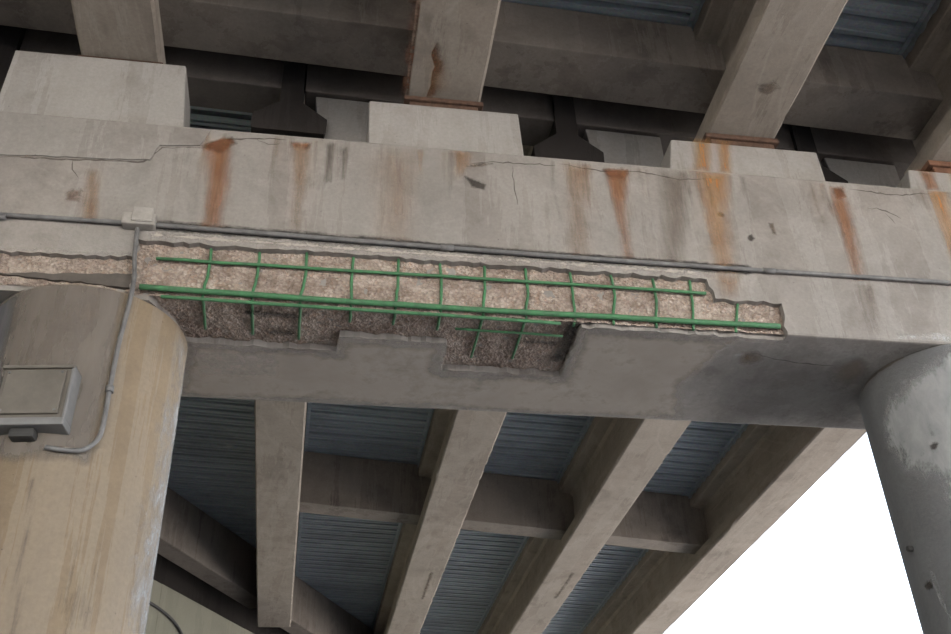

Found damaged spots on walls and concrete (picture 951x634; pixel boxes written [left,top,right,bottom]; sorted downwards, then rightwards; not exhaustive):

corrosion [426,47,441,97]
crack [7,138,284,177]
corrosion [204,138,235,223]
corrosion [605,169,626,209]
corrosion [834,188,853,252]
spalling [0,244,785,372]